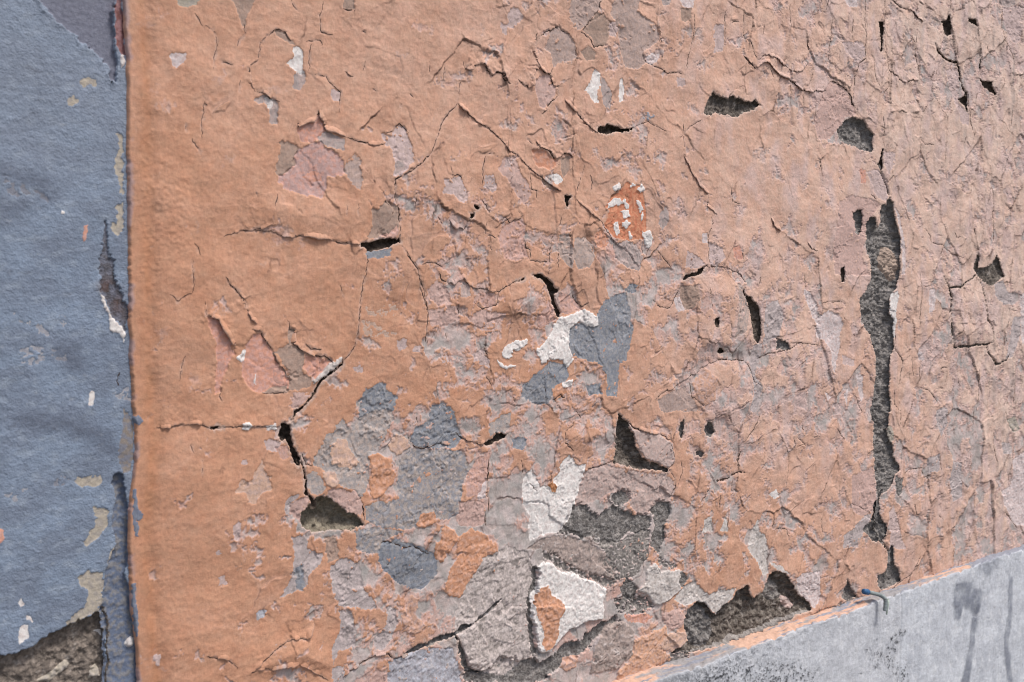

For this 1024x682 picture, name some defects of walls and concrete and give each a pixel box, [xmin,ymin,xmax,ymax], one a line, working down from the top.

crack [874,1,1024,143]
flaking render [98,133,129,343]
crack [158,194,369,471]
peeling [203,277,333,400]
crack [347,67,614,342]
peeling [557,182,669,271]
flaking render [804,150,906,590]
crack [894,186,1016,485]
flaking render [0,473,137,682]
crack [296,454,316,510]
crack [404,600,499,672]
peeling [280,420,859,682]